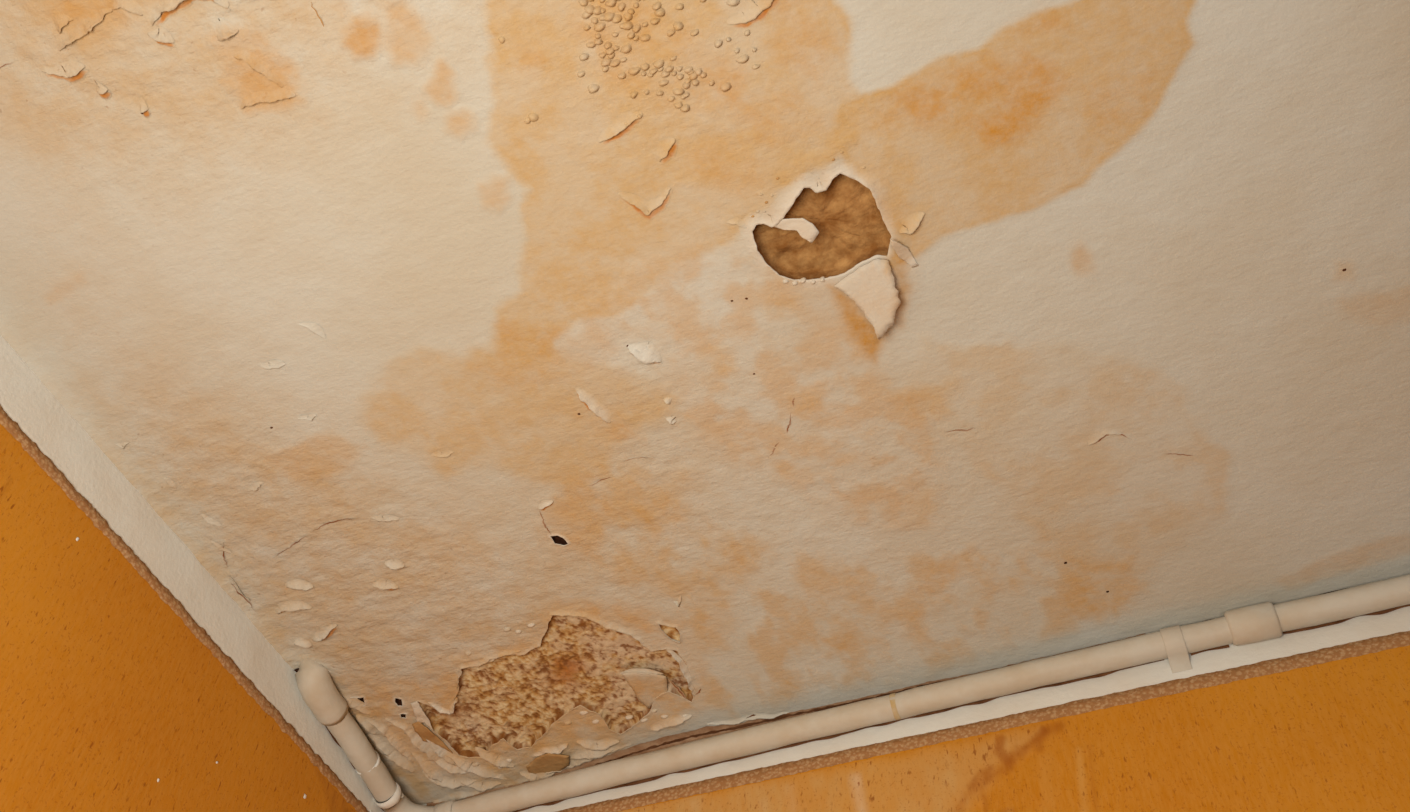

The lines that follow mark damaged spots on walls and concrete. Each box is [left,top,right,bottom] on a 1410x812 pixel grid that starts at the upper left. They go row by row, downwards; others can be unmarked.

peeling [41,61,111,100]
leakage [0,0,211,83]
peeling [147,0,230,48]
leakage [260,0,1241,723]
flaking render [339,610,700,792]